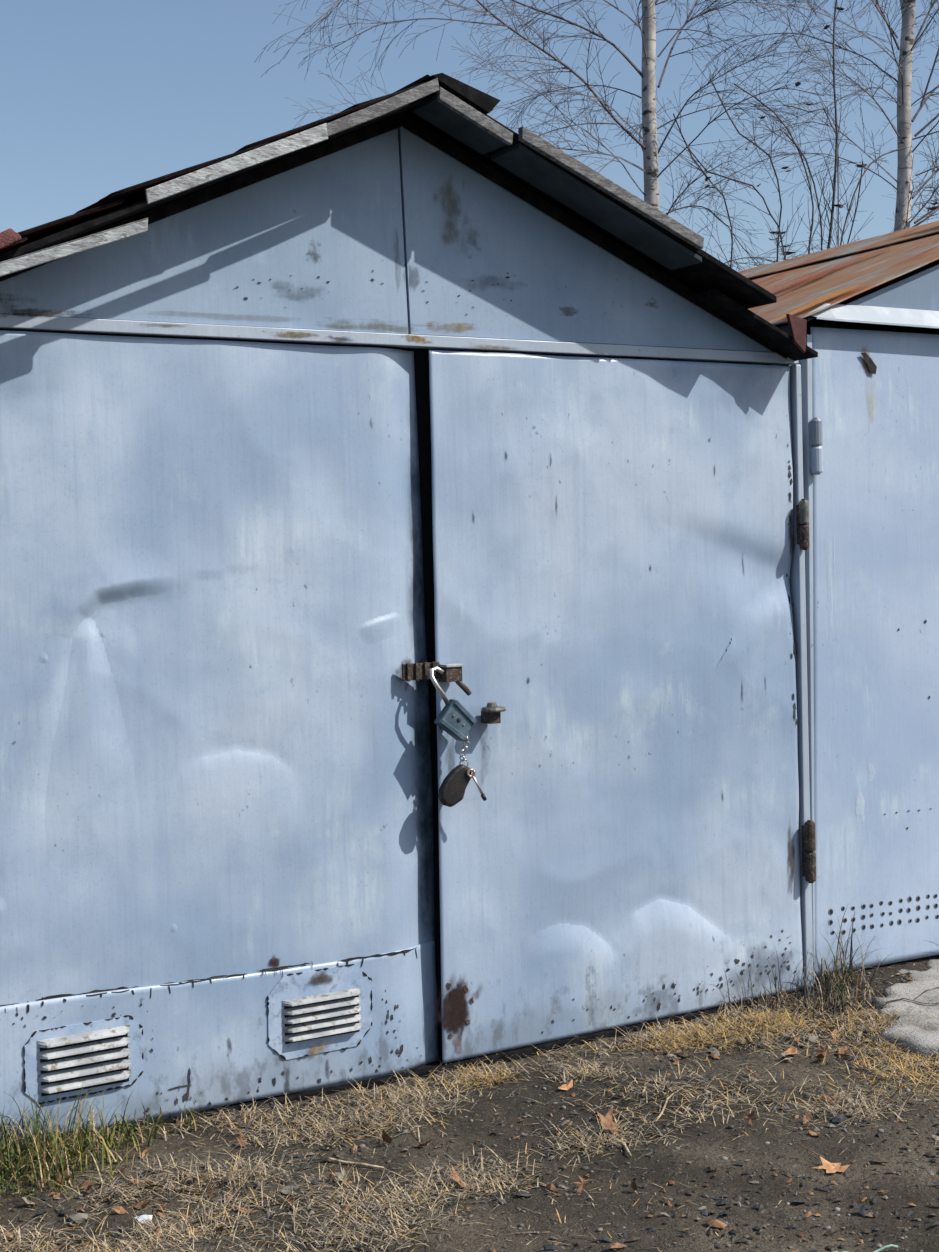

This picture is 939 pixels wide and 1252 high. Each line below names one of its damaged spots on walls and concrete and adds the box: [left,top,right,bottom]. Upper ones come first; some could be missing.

rust [779,285,857,318]
rust [861,352,877,375]
rust [311,972,332,984]
rust [442,983,478,1043]